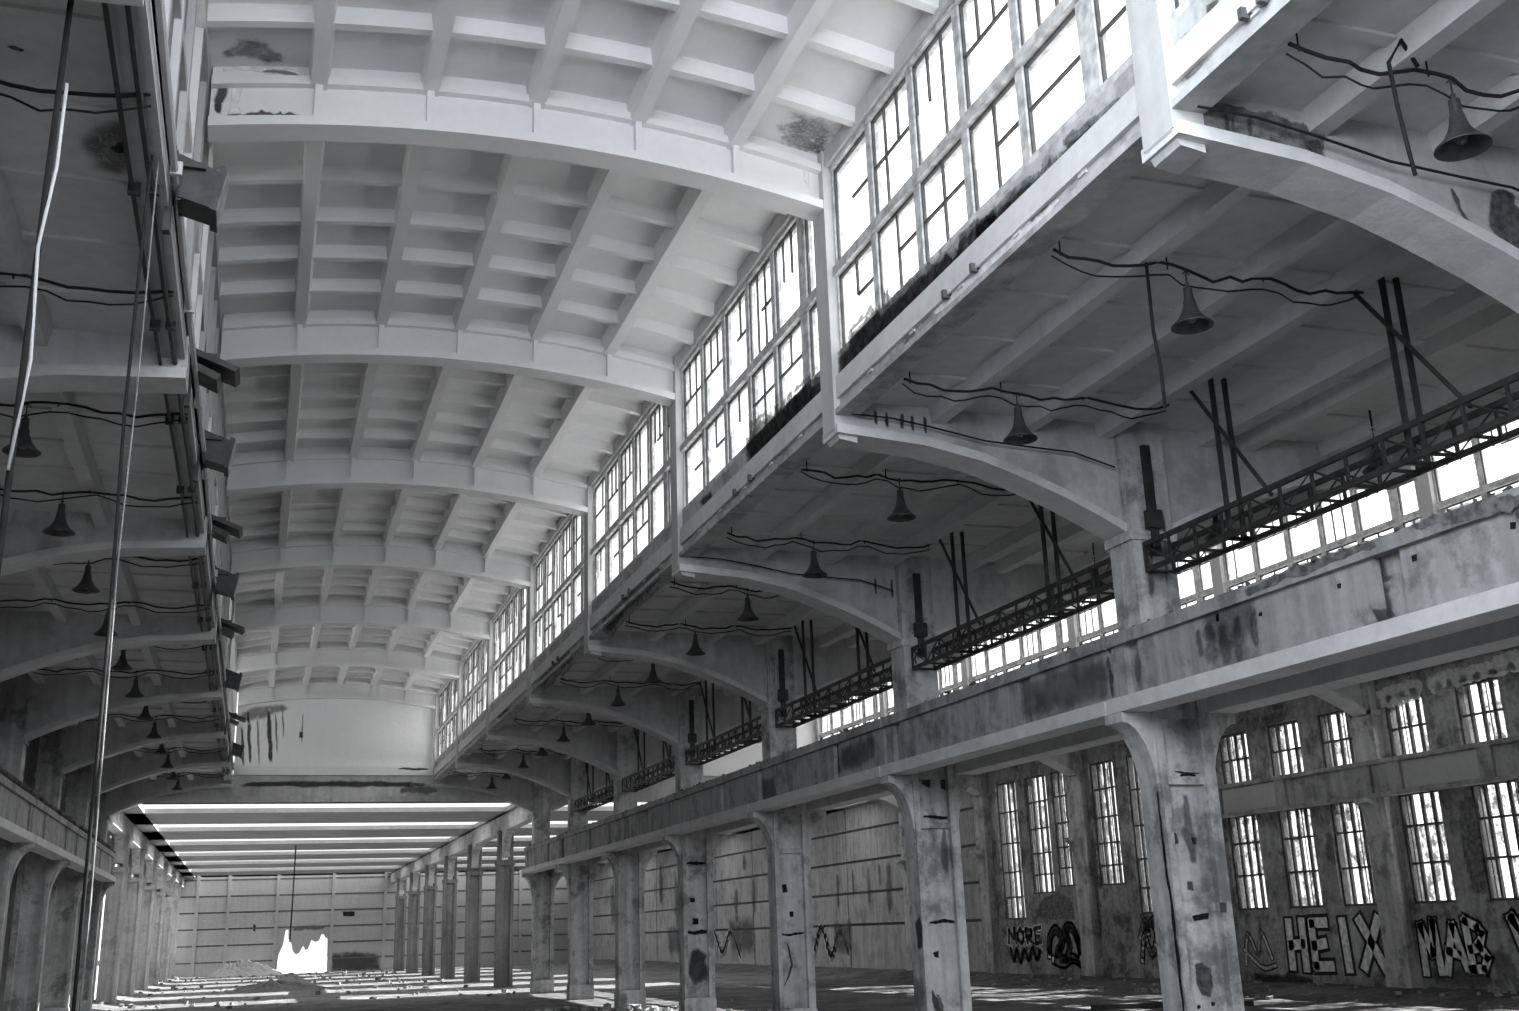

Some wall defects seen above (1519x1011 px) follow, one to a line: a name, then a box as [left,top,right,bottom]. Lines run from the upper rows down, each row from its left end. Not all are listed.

spalling [1451,189,1469,221]
spalling [1489,189,1519,249]